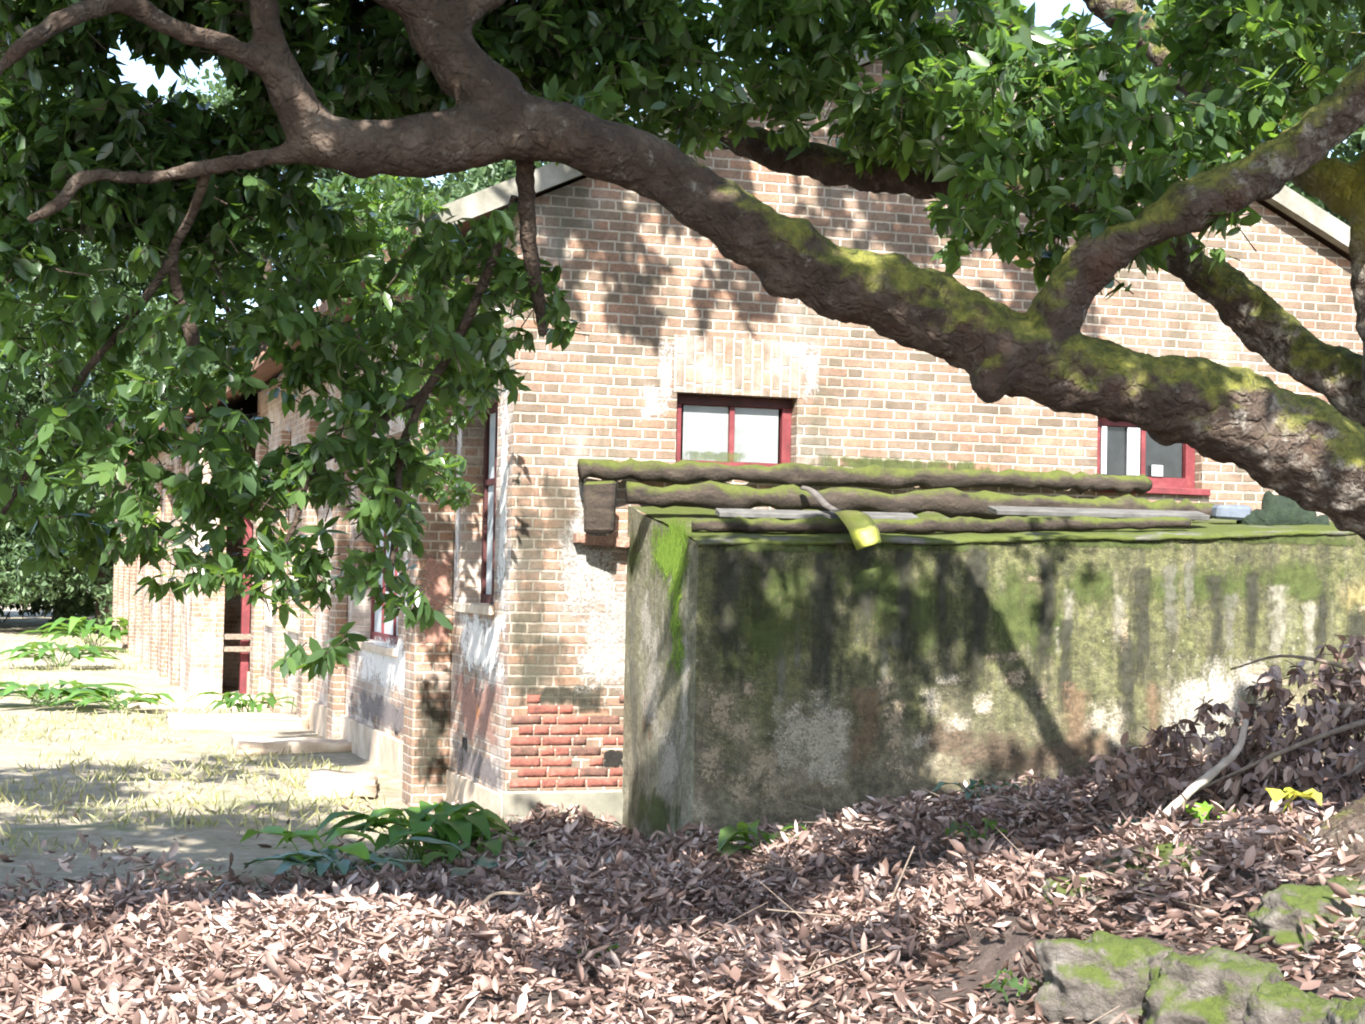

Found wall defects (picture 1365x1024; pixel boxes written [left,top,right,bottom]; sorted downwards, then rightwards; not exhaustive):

leakage [711,544,773,687]
leakage [776,540,837,703]
leakage [852,547,874,637]
leakage [880,545,917,682]
leakage [935,552,950,631]
leakage [965,548,989,688]
leakage [1037,556,1073,707]